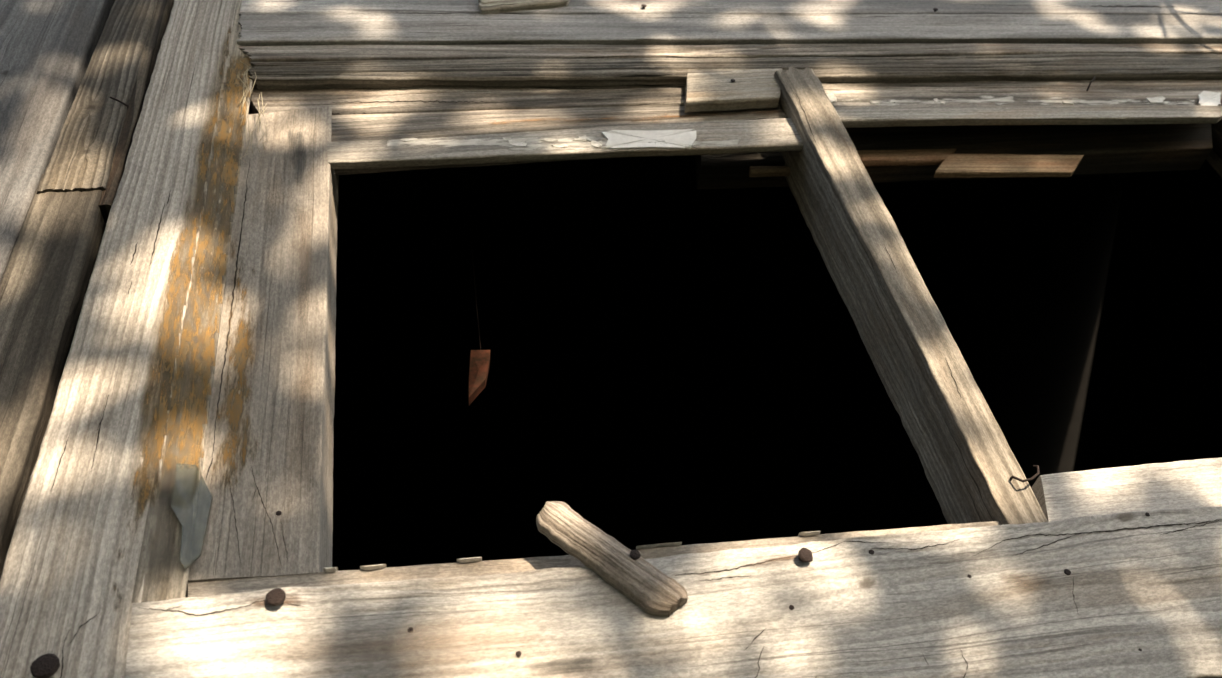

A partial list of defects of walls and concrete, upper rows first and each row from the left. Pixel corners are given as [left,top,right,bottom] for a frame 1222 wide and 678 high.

peeling [826,91,1221,106]
peeling [387,129,740,151]
crack [205,160,287,567]
crack [813,519,1222,556]
crack [675,560,772,581]
crack [138,600,305,616]